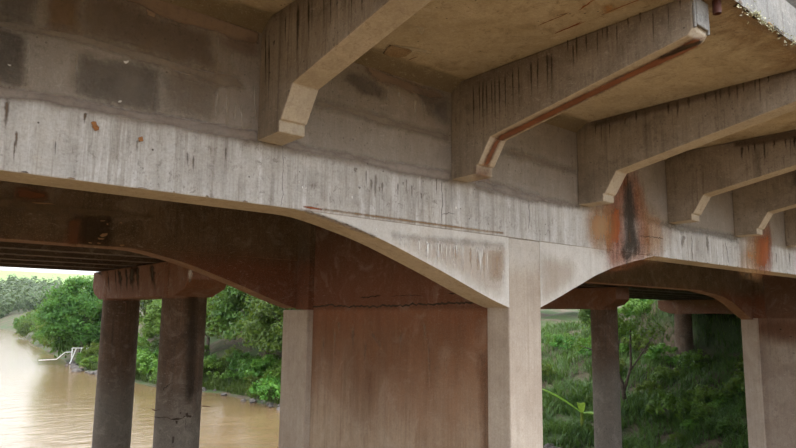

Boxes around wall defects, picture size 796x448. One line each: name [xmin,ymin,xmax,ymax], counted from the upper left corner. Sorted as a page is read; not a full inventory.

corrosion [478,38,702,175]
corrosion [589,178,659,264]
corrosion [746,230,771,270]
crack [313,293,473,308]
crack [154,412,191,443]